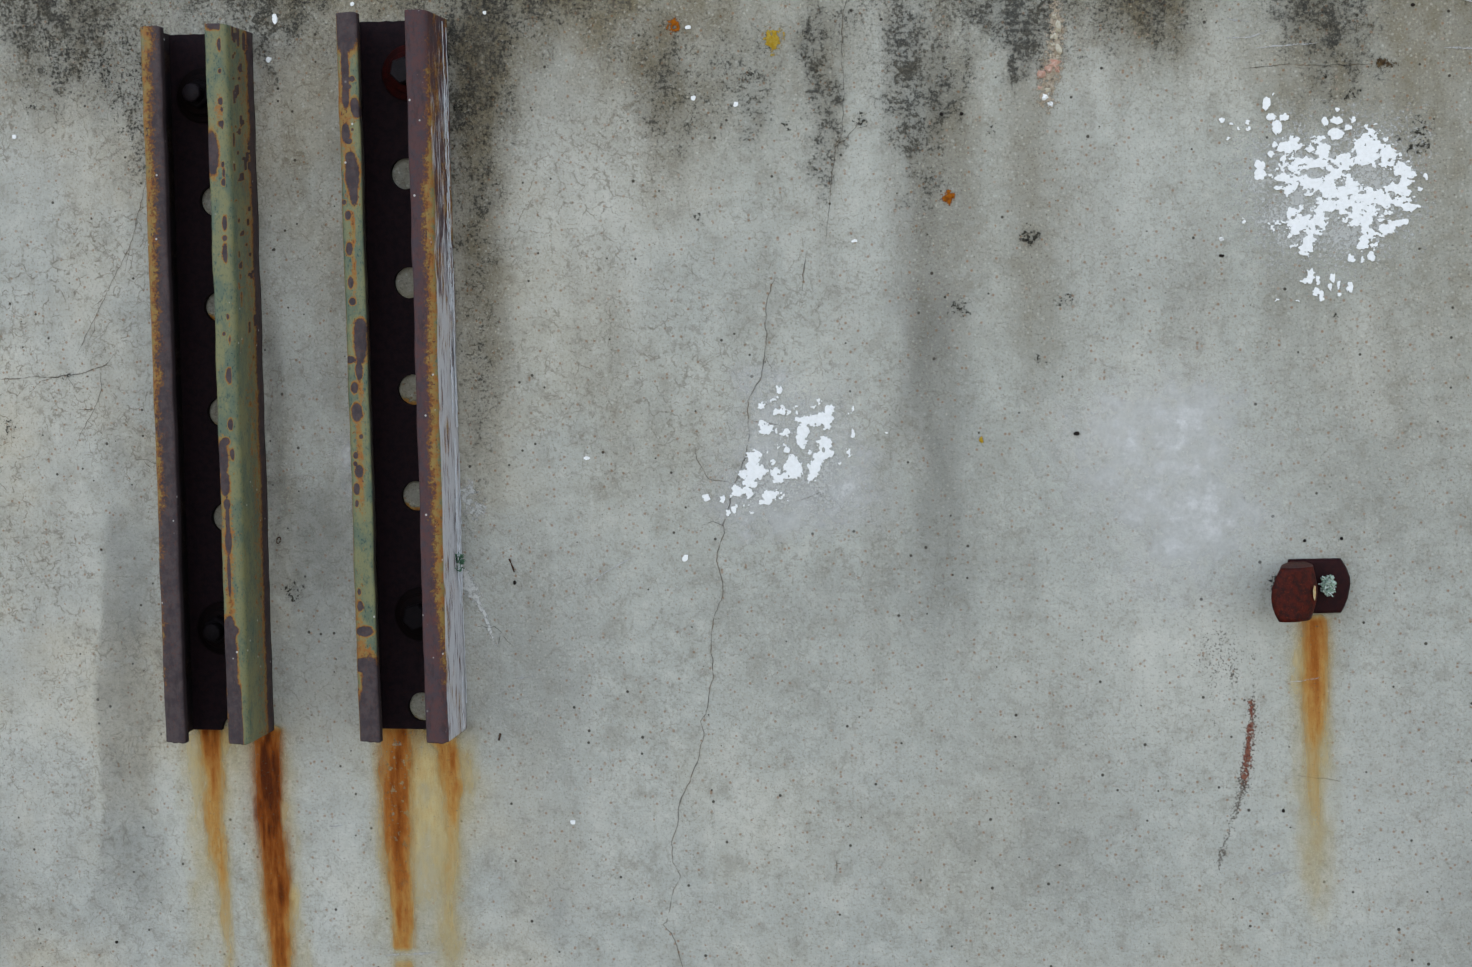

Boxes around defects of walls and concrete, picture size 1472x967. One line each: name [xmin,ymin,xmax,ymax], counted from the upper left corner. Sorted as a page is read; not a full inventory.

water stain [0,0,146,176]
water stain [440,0,591,445]
water stain [794,5,856,205]
water stain [874,0,975,216]
water stain [963,0,1200,84]
peeling [1219,93,1428,302]
water stain [1266,0,1383,103]
peeling [702,385,855,516]
rust [1292,615,1329,821]
rust [187,725,231,951]
rust [253,725,300,967]
rust [377,716,472,967]